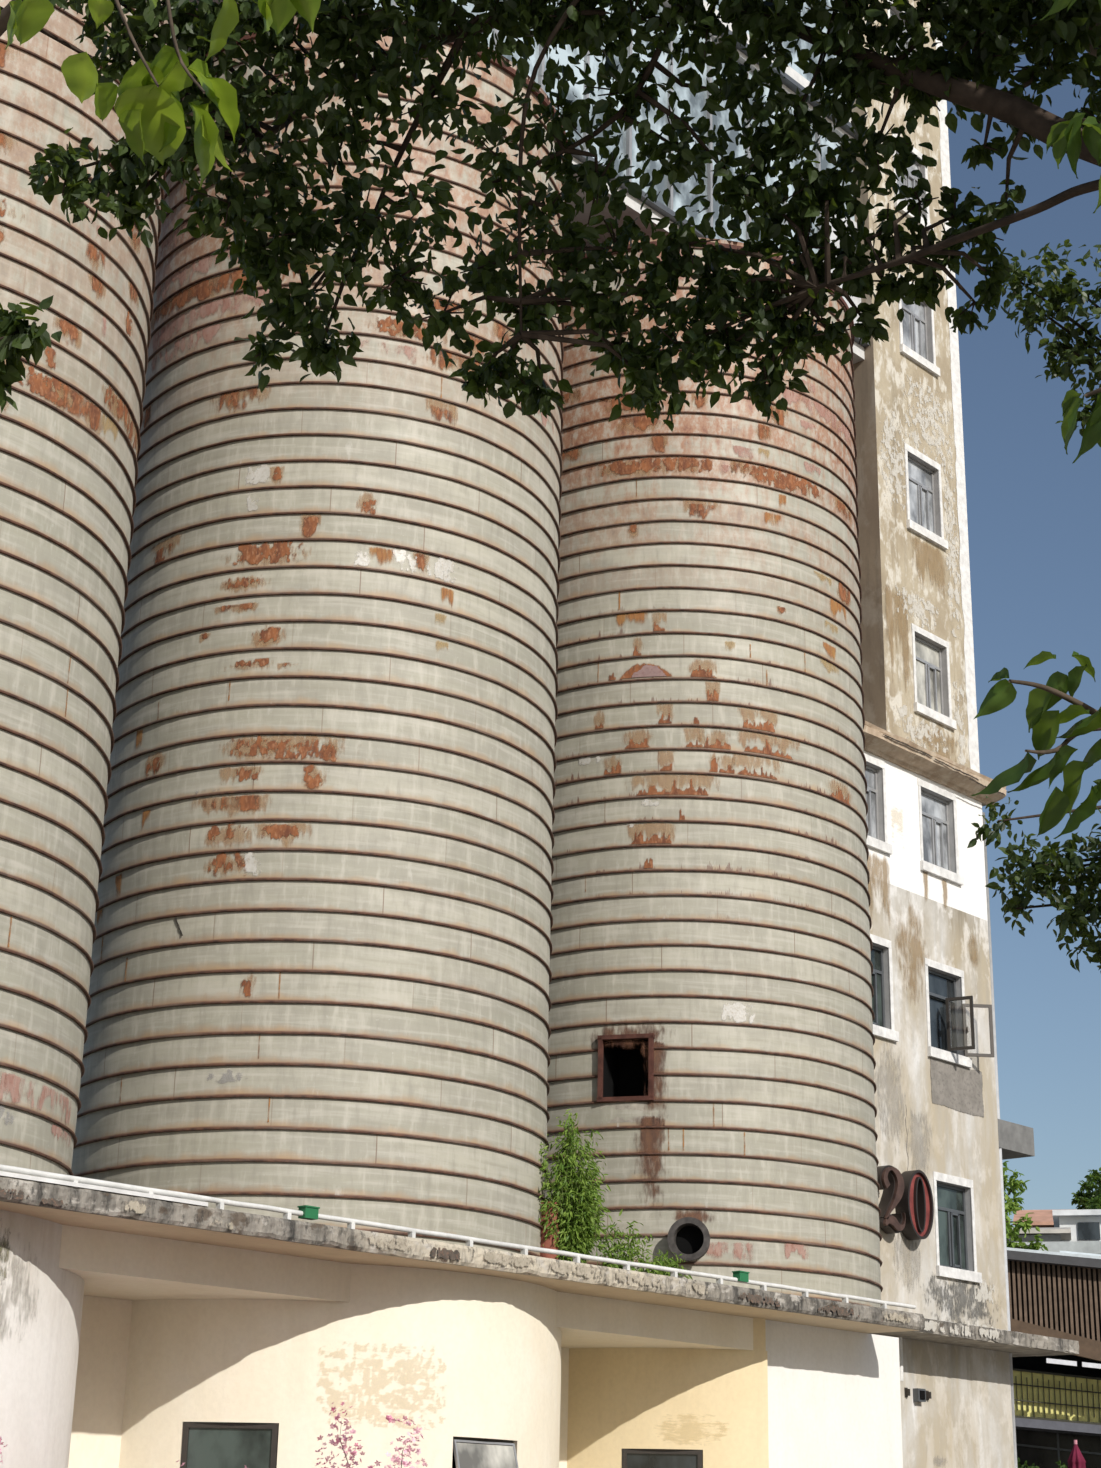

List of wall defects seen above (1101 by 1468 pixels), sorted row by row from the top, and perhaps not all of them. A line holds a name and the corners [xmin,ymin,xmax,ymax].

peeling [354,551,370,566]
peeling [393,550,456,583]
peeling [244,852,261,876]
rust [596,1027,684,1197]